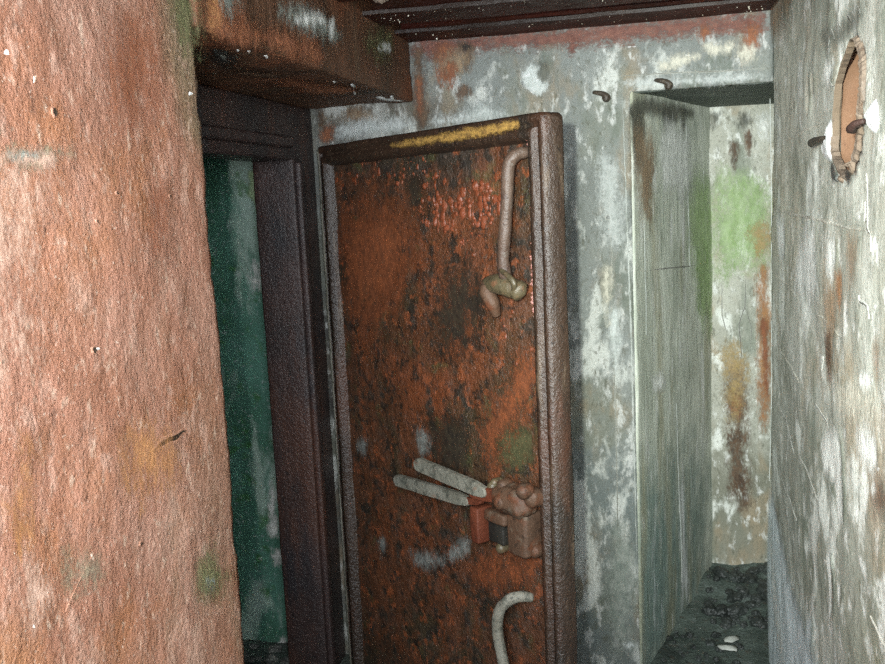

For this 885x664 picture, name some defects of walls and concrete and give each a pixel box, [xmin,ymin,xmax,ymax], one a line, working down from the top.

rust [411,0,790,128]
leakage [738,107,771,159]
spalling [824,36,867,184]
rust [479,347,536,469]
rust [722,266,771,511]